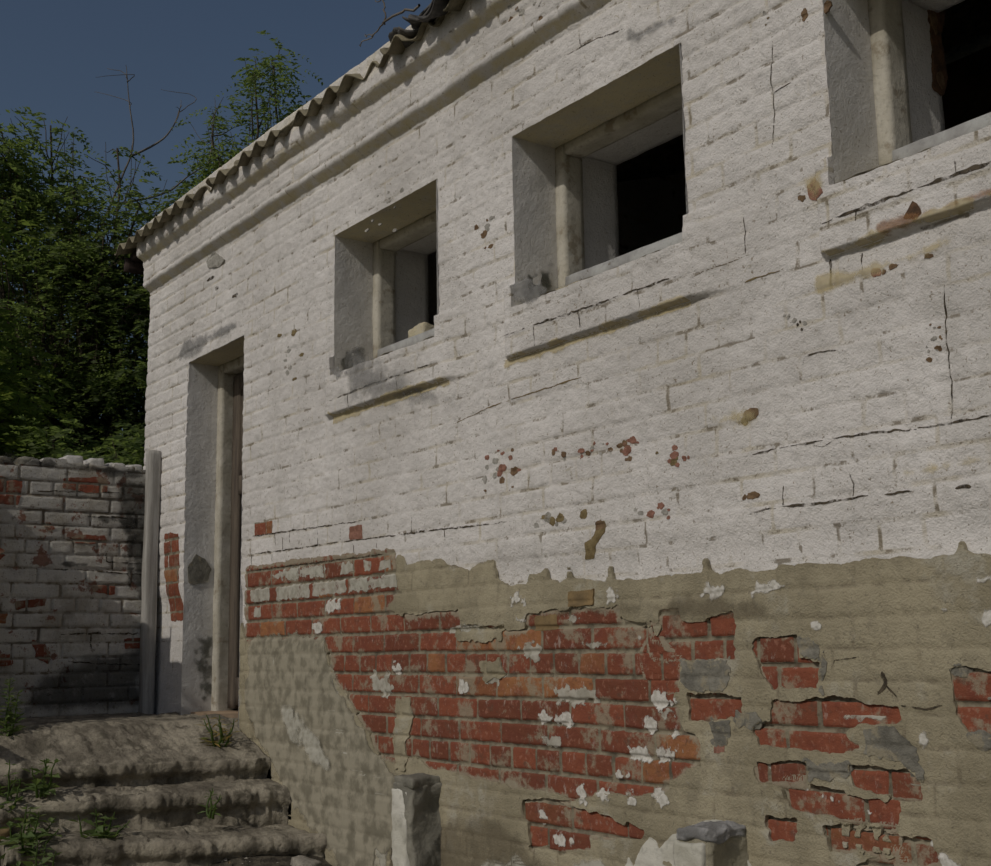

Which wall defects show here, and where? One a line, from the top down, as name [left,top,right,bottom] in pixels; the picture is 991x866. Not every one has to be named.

crack [770,41,791,145]
crack [822,161,990,224]
crack [747,286,991,457]
peeling [482,448,521,492]
peeling [552,436,639,461]
peeling [655,445,690,467]
crack [757,476,910,513]
crack [955,482,971,490]
damp [100,483,145,595]
spalling [580,509,606,560]
flaking render [164,532,211,622]
peeling [238,541,991,866]